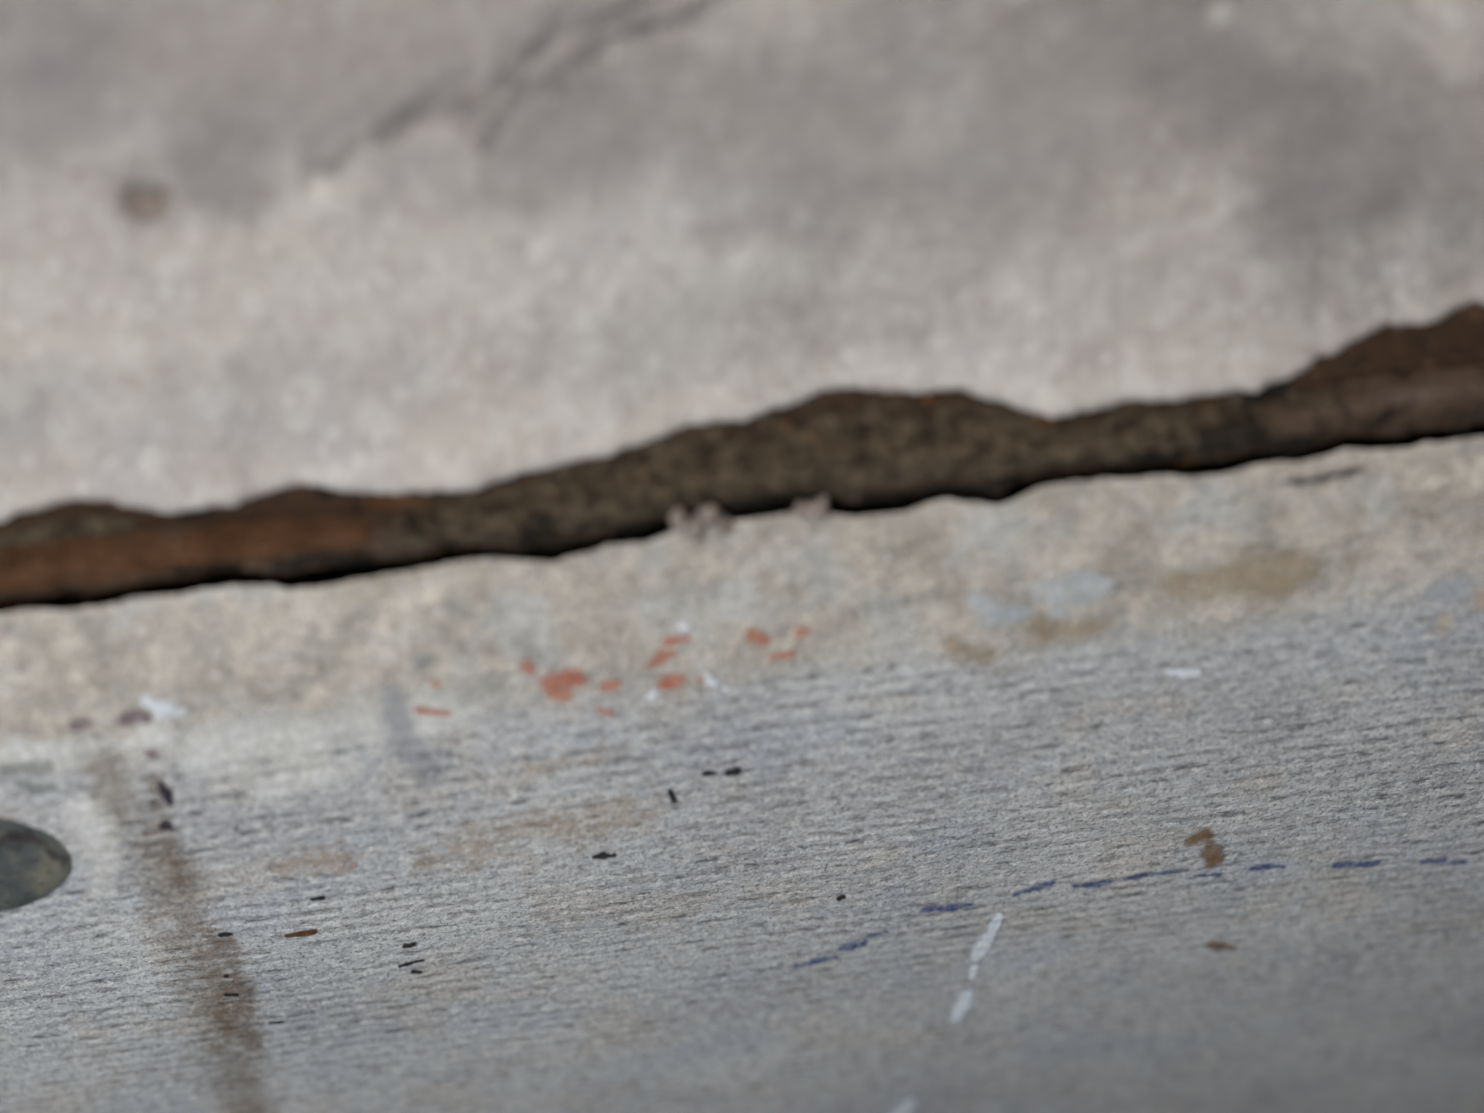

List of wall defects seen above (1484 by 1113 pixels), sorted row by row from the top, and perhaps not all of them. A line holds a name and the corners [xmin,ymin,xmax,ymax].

rust [1031,414,1057,423]
rust [0,493,430,610]
peeling [702,670,730,693]